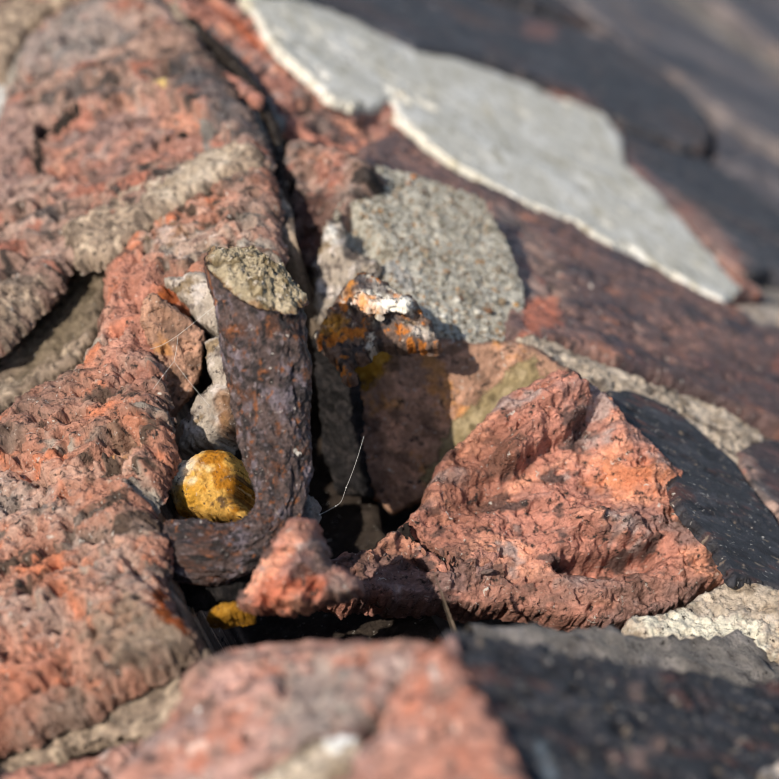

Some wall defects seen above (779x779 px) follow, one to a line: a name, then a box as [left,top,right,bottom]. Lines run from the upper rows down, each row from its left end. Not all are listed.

rust [312,272,443,498]